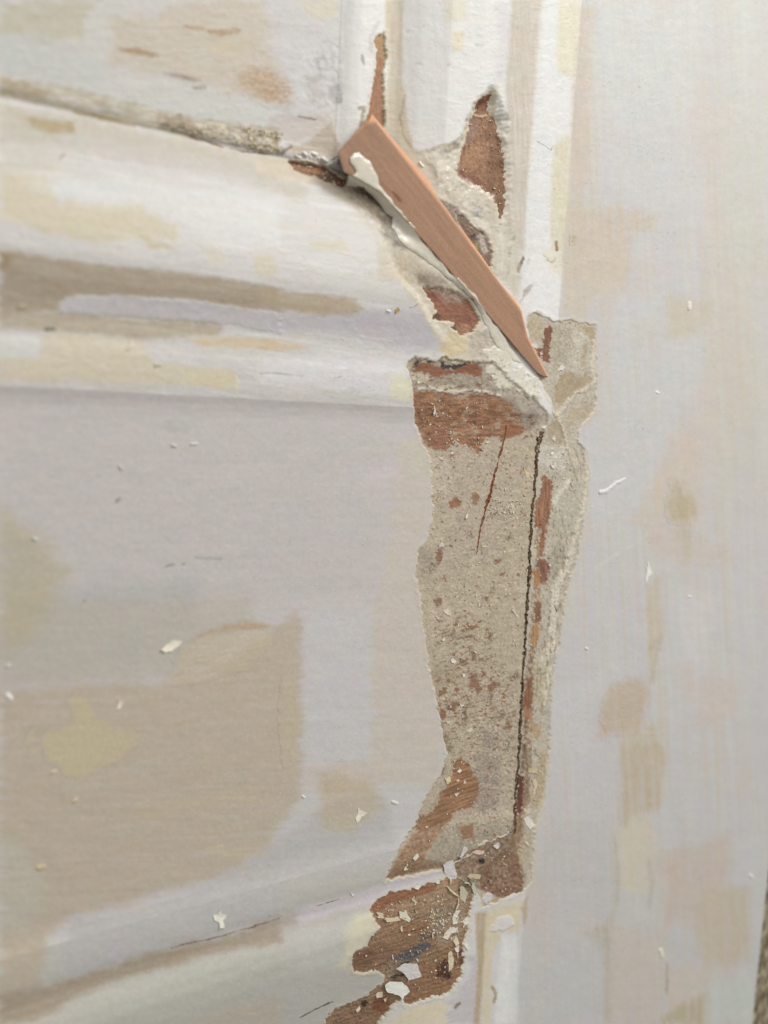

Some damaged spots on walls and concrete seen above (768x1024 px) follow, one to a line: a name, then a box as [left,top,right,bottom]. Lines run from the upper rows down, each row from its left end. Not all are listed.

peeling [366,35,385,126]
peeling [460,94,506,225]
peeling [457,214,492,266]
peeling [423,287,478,335]
crack [476,425,507,555]
peeling [326,313,596,1024]
crack [513,431,557,834]